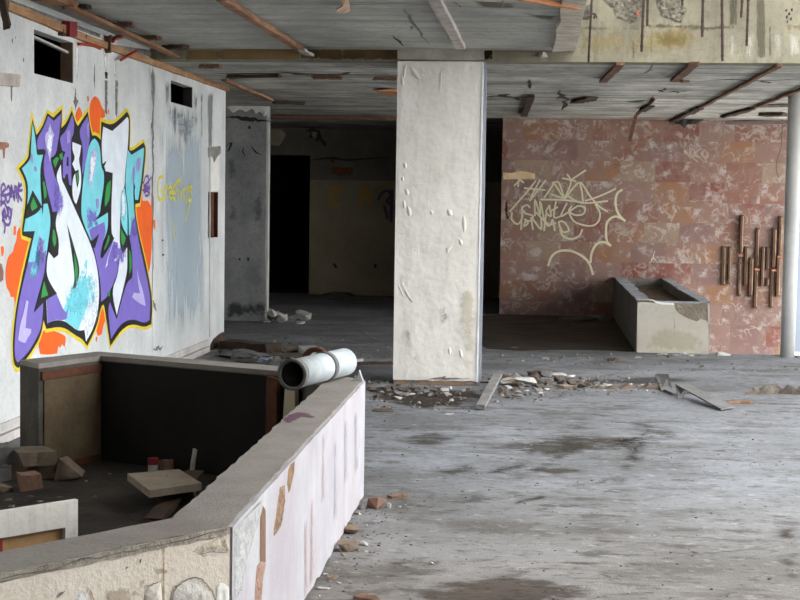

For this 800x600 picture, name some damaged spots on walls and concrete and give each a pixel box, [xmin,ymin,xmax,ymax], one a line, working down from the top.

crack [385,3,430,47]
spalling [603,0,688,52]
peeling [228,106,286,312]
spalling [653,300,708,321]
peeling [216,583,229,600]